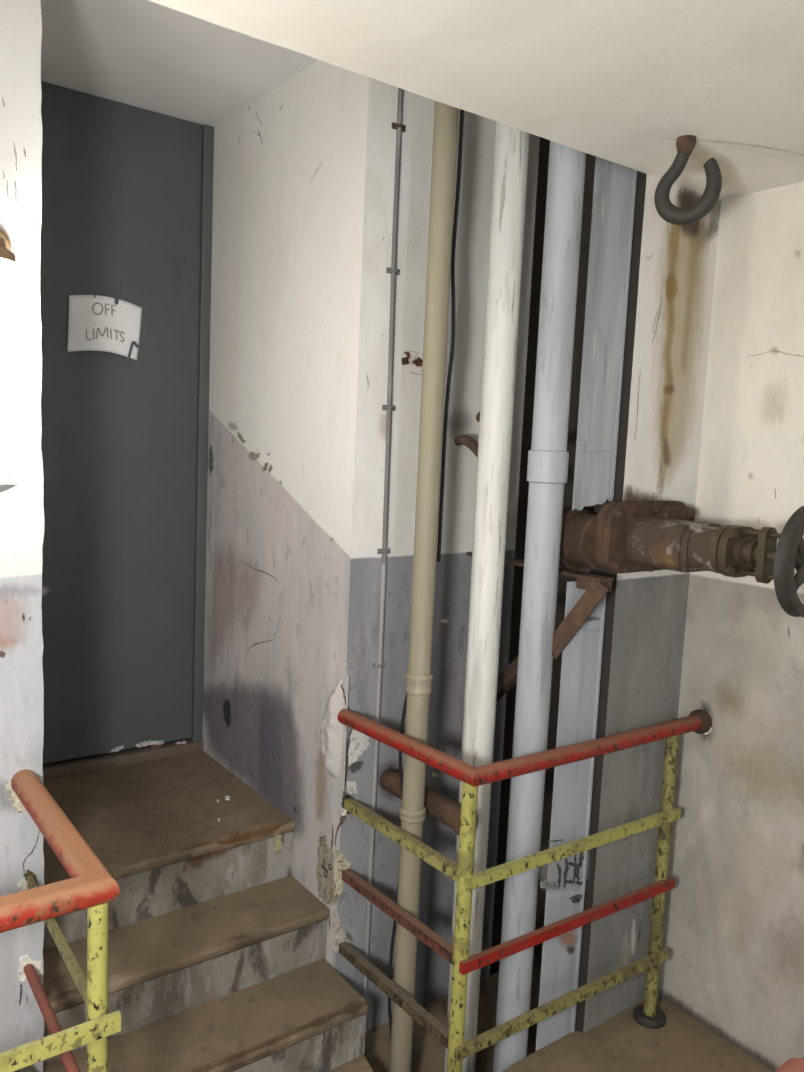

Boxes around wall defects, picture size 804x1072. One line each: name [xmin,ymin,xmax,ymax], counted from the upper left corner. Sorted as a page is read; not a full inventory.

rust [662,224,679,439]
crack [747,350,804,358]
peeling [237,432,282,485]
spalling [316,835,353,954]